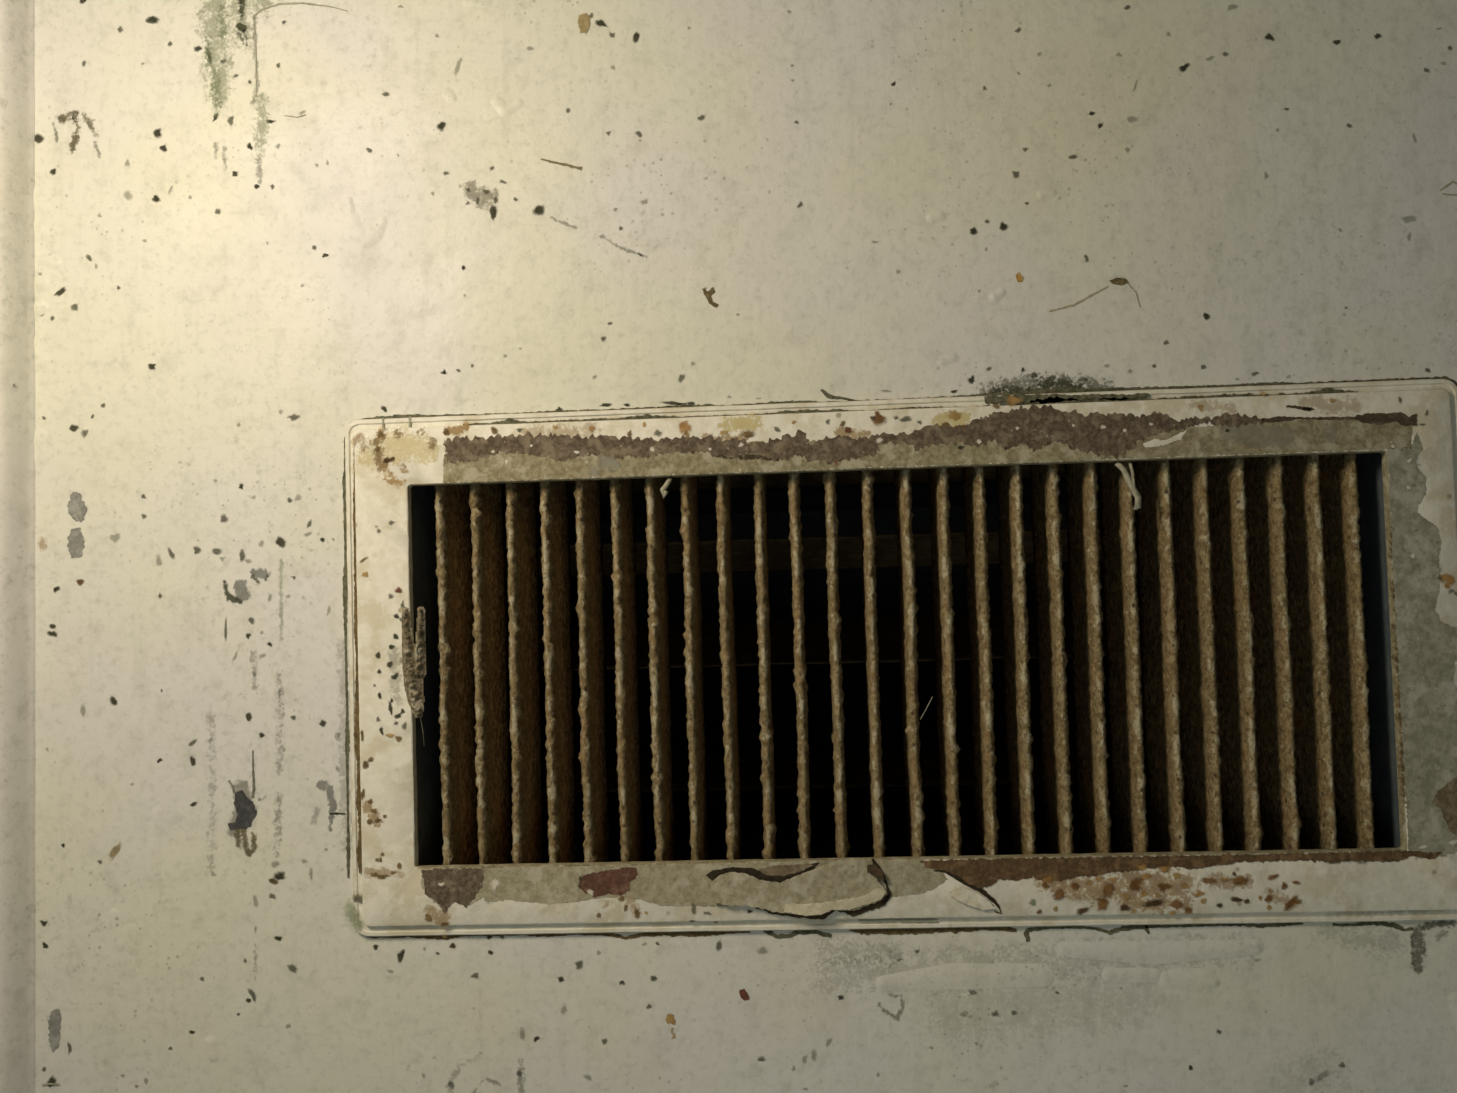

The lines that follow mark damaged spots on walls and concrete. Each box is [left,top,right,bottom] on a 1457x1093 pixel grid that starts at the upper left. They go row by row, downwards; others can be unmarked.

damp [236,0,248,46]
rust [679,412,796,441]
rust [826,410,970,438]
peeling [443,405,1457,859]
peeling [420,858,948,920]
rust [920,850,1443,915]